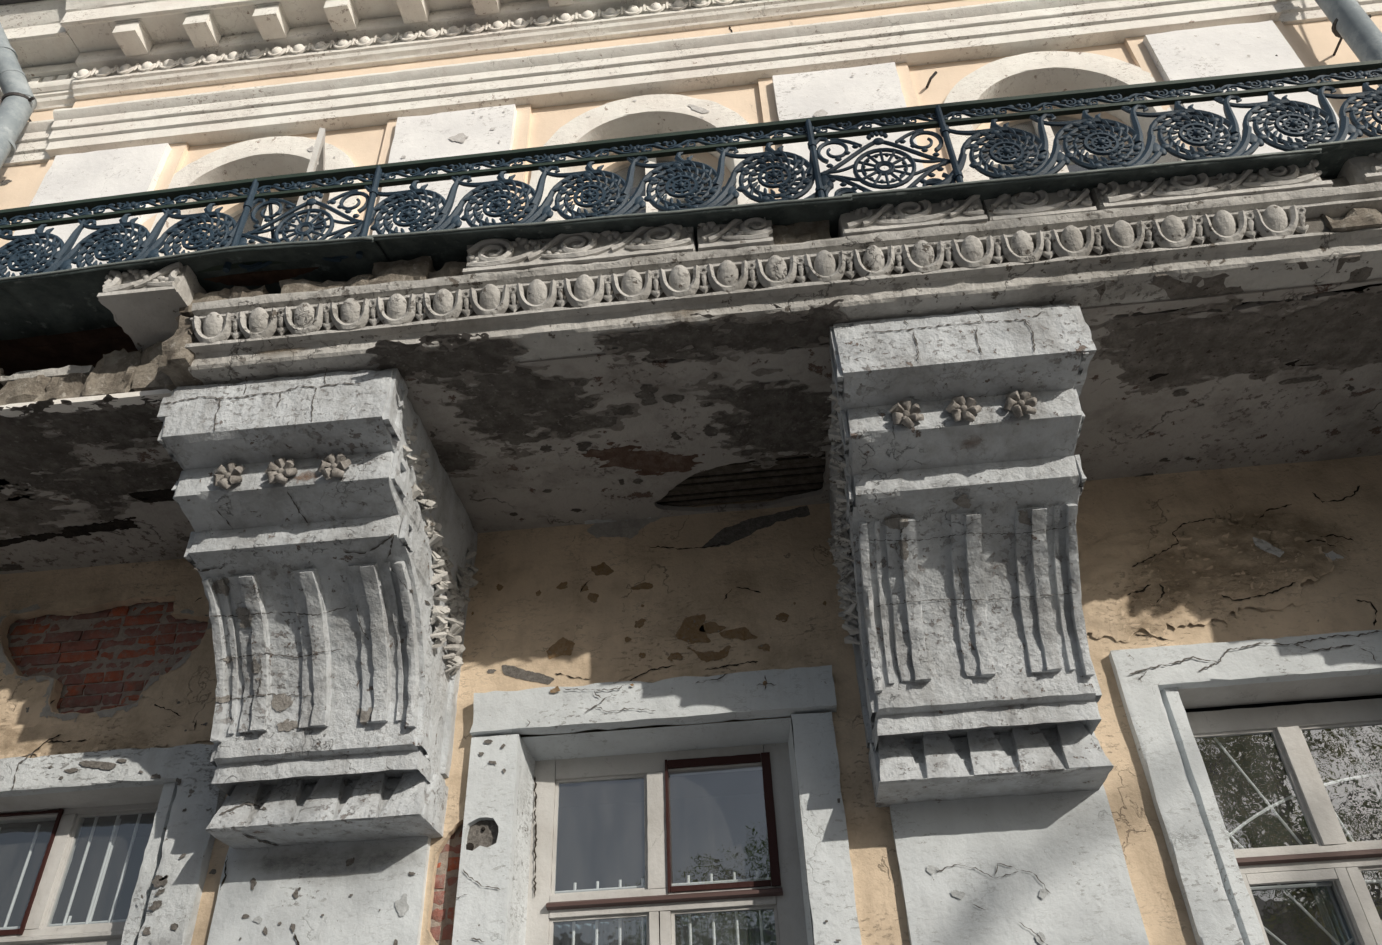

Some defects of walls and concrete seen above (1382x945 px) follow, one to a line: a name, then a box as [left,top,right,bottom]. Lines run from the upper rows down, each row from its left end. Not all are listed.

peeling [1066,254,1382,397]
peeling [0,256,466,547]
peeling [365,299,850,485]
spalling [0,601,212,722]
spalling [487,637,575,693]
peeling [667,614,770,662]
crack [871,508,1076,621]
crack [1128,518,1221,602]
crack [1130,599,1379,680]
crack [1222,582,1295,601]
crack [1260,486,1360,546]
spalling [430,824,463,945]